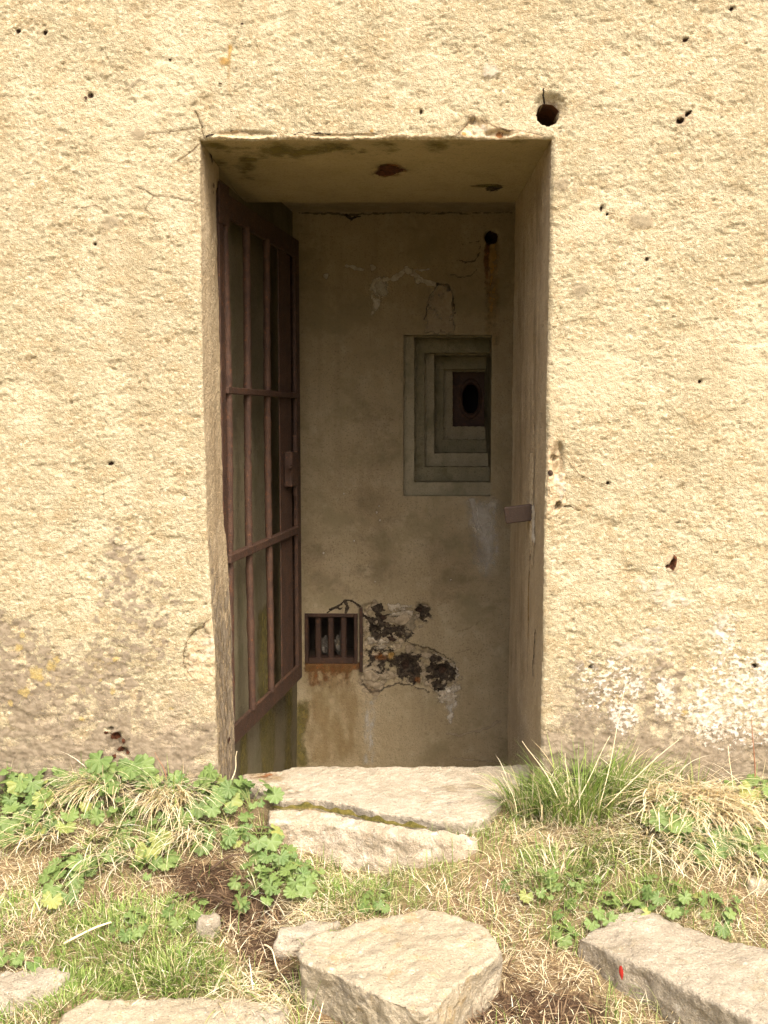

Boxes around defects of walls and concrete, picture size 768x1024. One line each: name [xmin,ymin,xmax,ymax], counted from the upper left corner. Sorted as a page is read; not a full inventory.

rust [376,164,407,177]
rust [305,663,359,685]
spalling [358,600,463,724]
damp [541,633,768,788]
spalling [104,727,130,759]